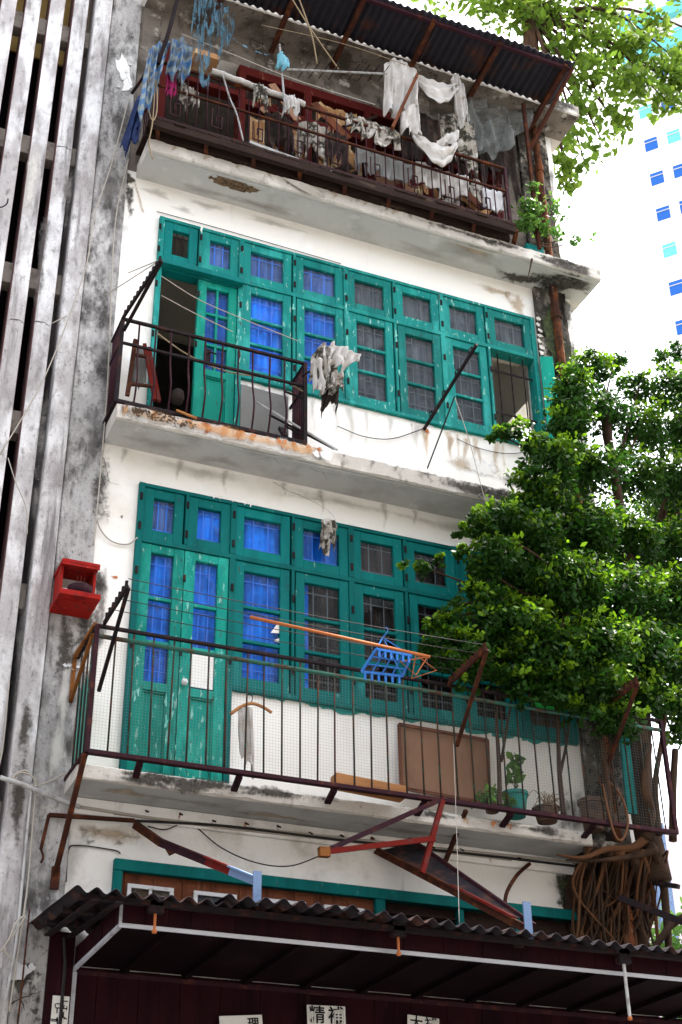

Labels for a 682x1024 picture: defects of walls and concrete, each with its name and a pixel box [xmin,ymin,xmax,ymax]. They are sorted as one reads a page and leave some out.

spalling [208,174,262,195]
water stain [105,173,144,235]
water stain [437,224,518,254]
water stain [488,255,589,362]
rust [125,406,321,459]
water stain [87,409,109,517]
water stain [442,477,517,500]
water stain [115,771,230,796]
water stain [244,786,301,798]